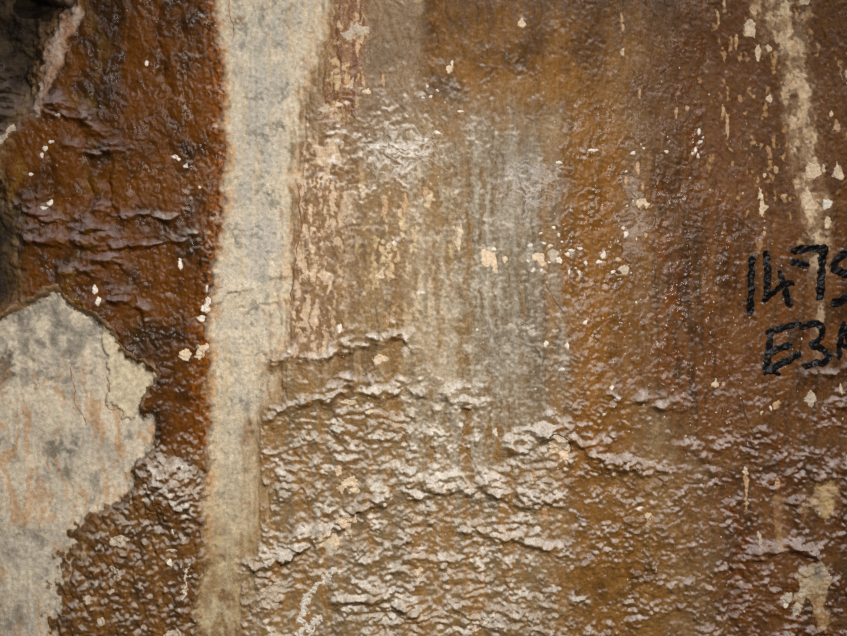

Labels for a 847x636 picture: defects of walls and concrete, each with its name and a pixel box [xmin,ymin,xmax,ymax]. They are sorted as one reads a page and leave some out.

peeling [340,11,369,57]
peeling [344,72,371,94]
rust [0,0,228,478]
peeling [372,354,389,365]
leakage [191,0,847,636]
spalling [0,283,161,636]
rust [48,459,210,636]